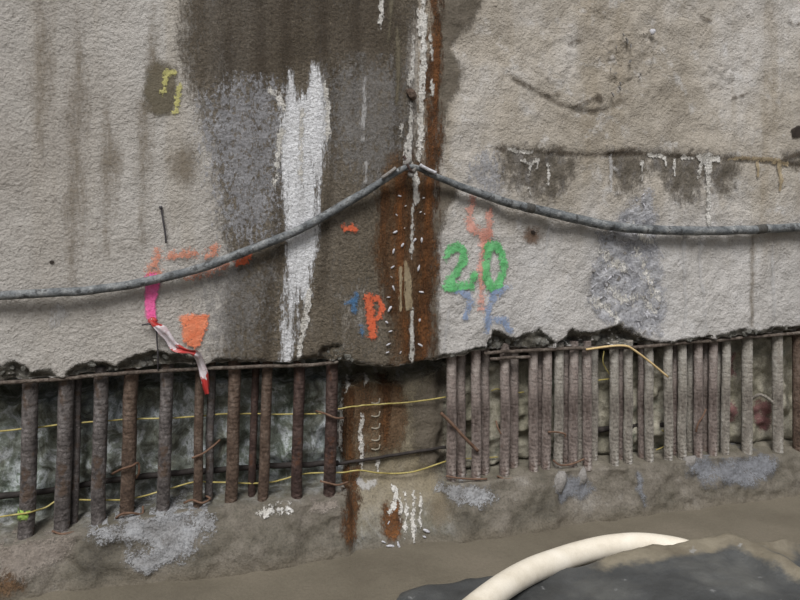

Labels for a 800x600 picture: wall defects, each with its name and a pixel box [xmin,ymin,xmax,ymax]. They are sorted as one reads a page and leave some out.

leakage [143,0,500,511]
corrosion [337,0,445,546]
peeling [0,188,800,540]
leakage [381,484,430,547]
leakage [498,142,577,204]
leakage [609,147,800,226]